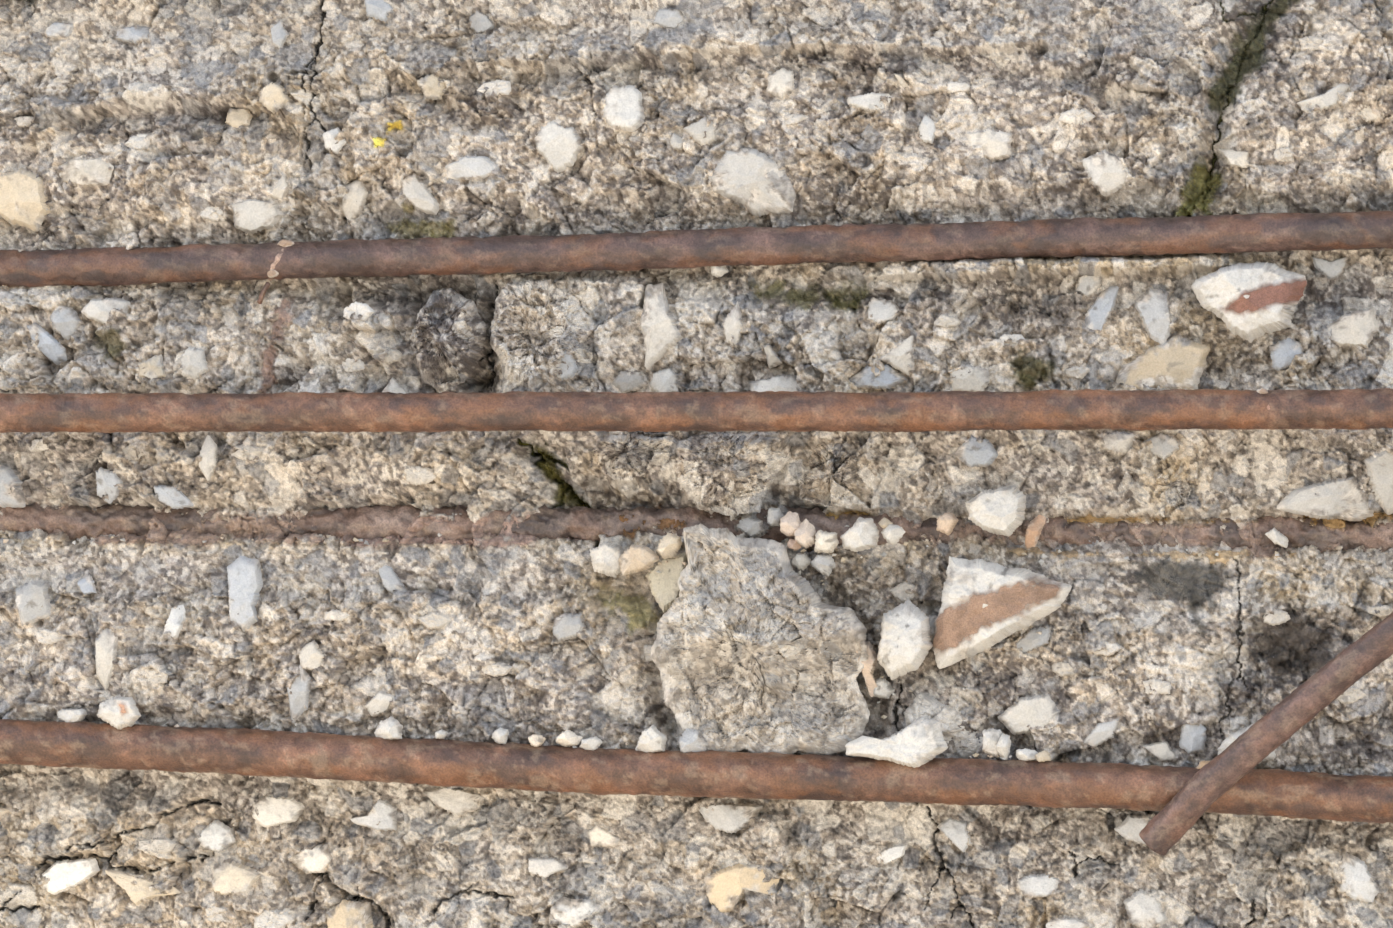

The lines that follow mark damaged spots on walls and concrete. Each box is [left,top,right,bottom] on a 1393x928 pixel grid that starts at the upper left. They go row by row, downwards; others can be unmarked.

crack [1220,0,1273,22]
crack [301,0,326,168]
spalling [338,63,1174,233]
crack [1210,104,1229,175]
spalling [1253,4,1393,208]
corrosion [94,512,536,547]
corrosion [605,506,686,539]
corrosion [911,514,1295,564]
corrosion [1303,512,1393,550]
spalling [0,563,684,736]
spalling [961,618,1235,755]
crack [0,799,222,913]